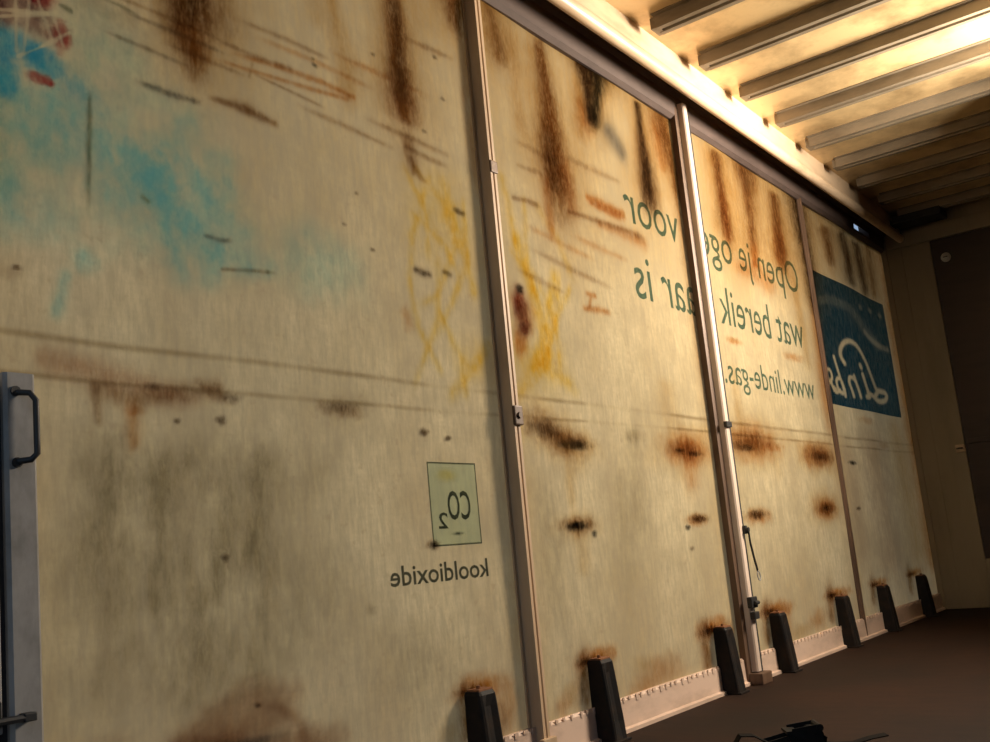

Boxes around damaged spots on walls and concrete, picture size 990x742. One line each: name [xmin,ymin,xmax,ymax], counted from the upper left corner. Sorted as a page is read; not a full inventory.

corrosion [174,0,209,73]
corrosion [387,0,413,124]
corrosion [536,43,568,204]
corrosion [543,423,584,449]
corrosion [568,520,596,536]